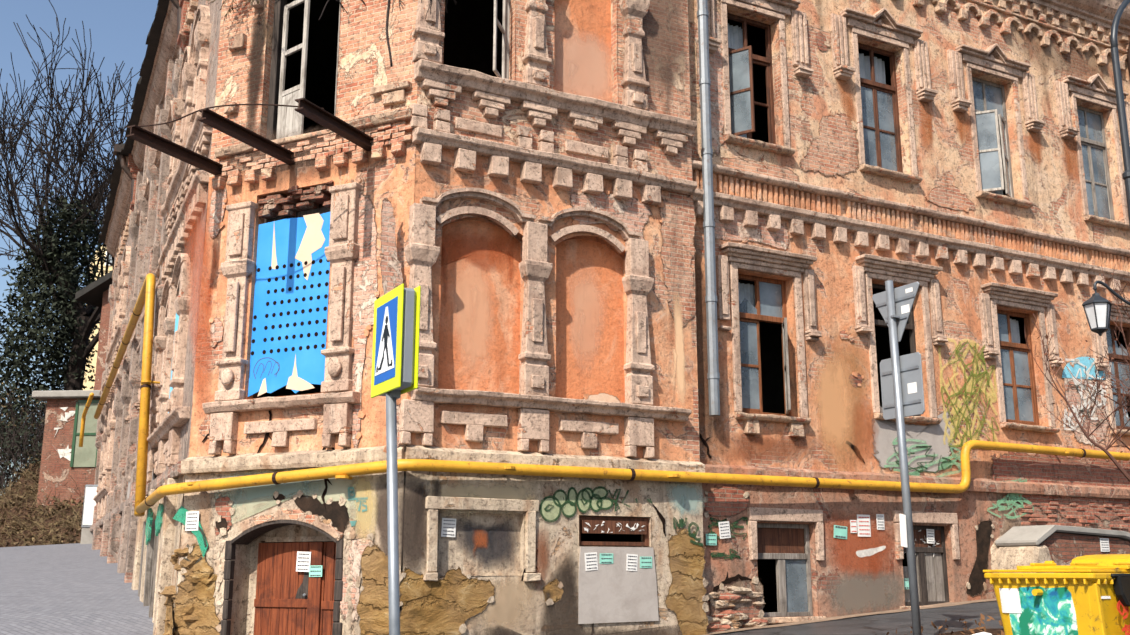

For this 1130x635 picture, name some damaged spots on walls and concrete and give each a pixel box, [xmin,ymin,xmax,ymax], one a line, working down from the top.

flaking render [160,494,235,635]
water stain [218,476,530,569]
flaking render [273,490,496,635]
flaking render [665,528,768,635]
spalling [702,486,749,518]